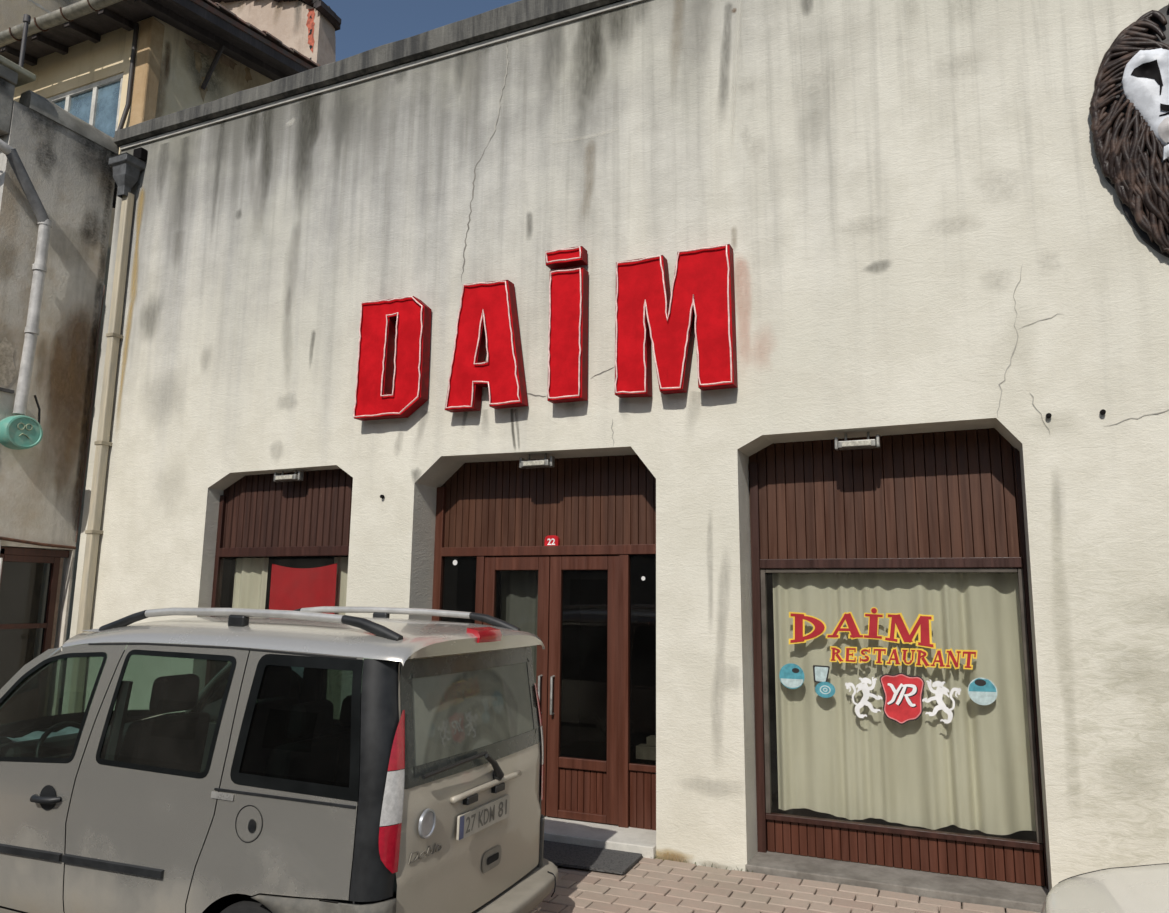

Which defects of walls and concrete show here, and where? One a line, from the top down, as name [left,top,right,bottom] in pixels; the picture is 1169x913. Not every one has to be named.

leakage [582,0,625,88]
crack [461,40,508,282]
crack [997,267,1058,433]
crack [1107,409,1169,426]